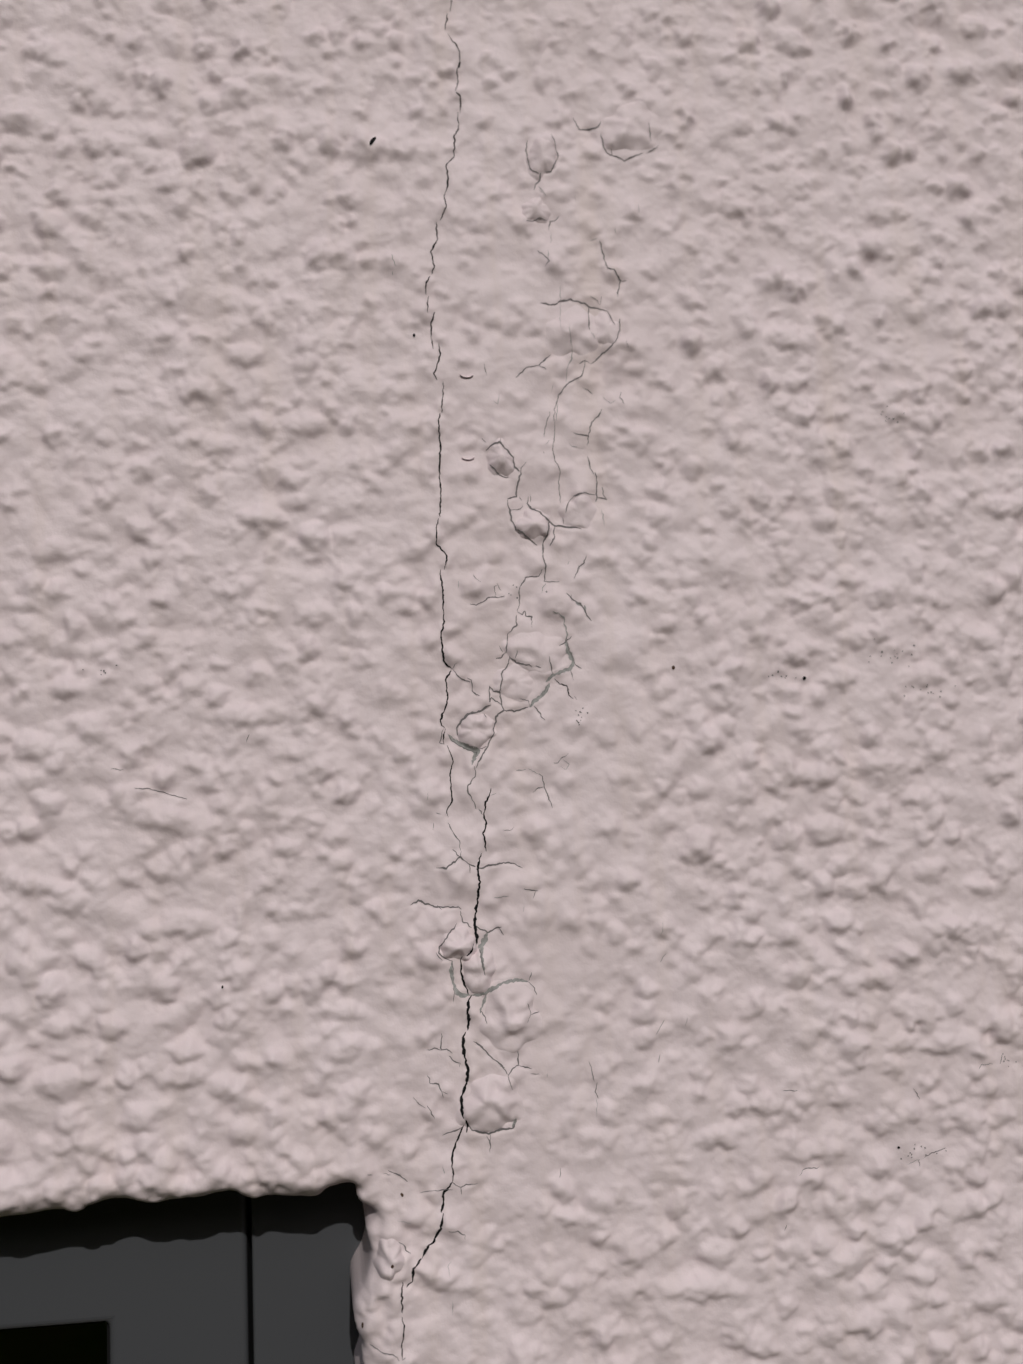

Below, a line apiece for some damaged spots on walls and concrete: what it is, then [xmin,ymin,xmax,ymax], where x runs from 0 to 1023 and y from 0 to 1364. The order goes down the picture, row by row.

crack [371,0,658,1361]